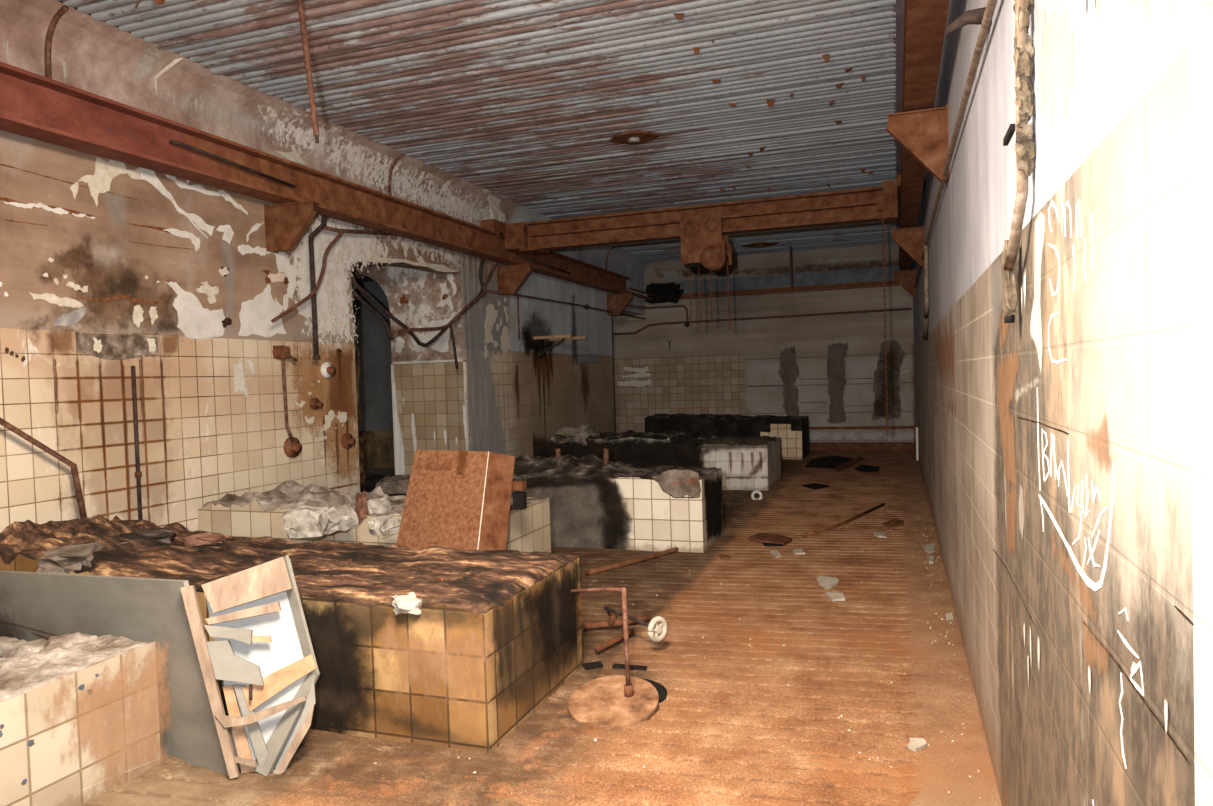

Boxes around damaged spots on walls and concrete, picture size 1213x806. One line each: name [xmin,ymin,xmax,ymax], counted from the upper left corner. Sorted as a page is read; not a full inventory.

peeling [133,48,507,226]
peeling [29,157,463,360]
peeling [481,297,512,360]
rust [292,347,359,479]
damp [1023,624,1040,684]